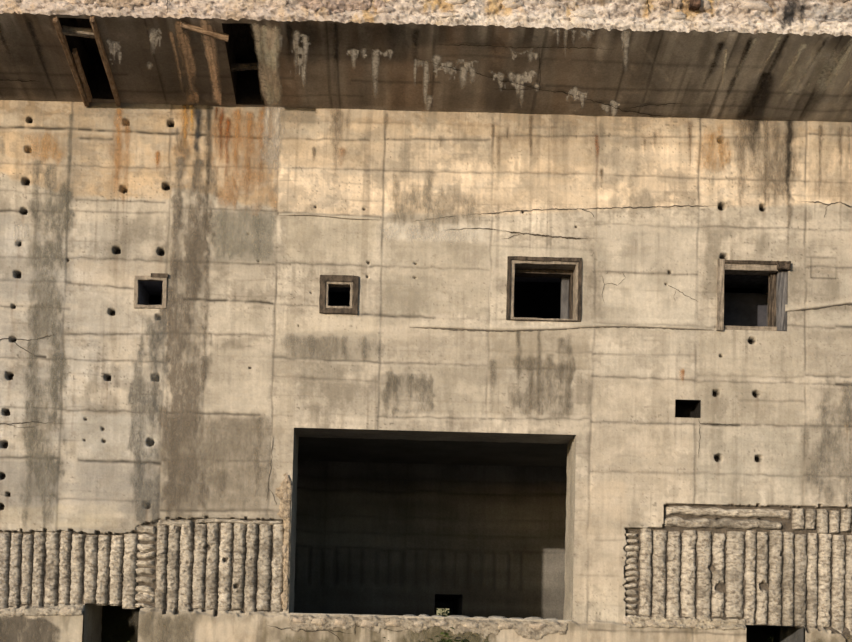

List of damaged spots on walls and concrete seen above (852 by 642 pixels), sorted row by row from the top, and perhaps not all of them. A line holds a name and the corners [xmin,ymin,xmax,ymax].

leakage [783,0,804,25]
spalling [53,0,157,107]
hole [180,21,265,105]
leakage [347,50,392,91]
leakage [414,55,476,108]
efflorescence [491,71,539,99]
corrosion [215,107,264,162]
crack [416,205,719,239]
leakage [128,20,265,526]
crack [0,334,56,356]
leakage [23,162,74,527]
spalling [0,473,568,640]